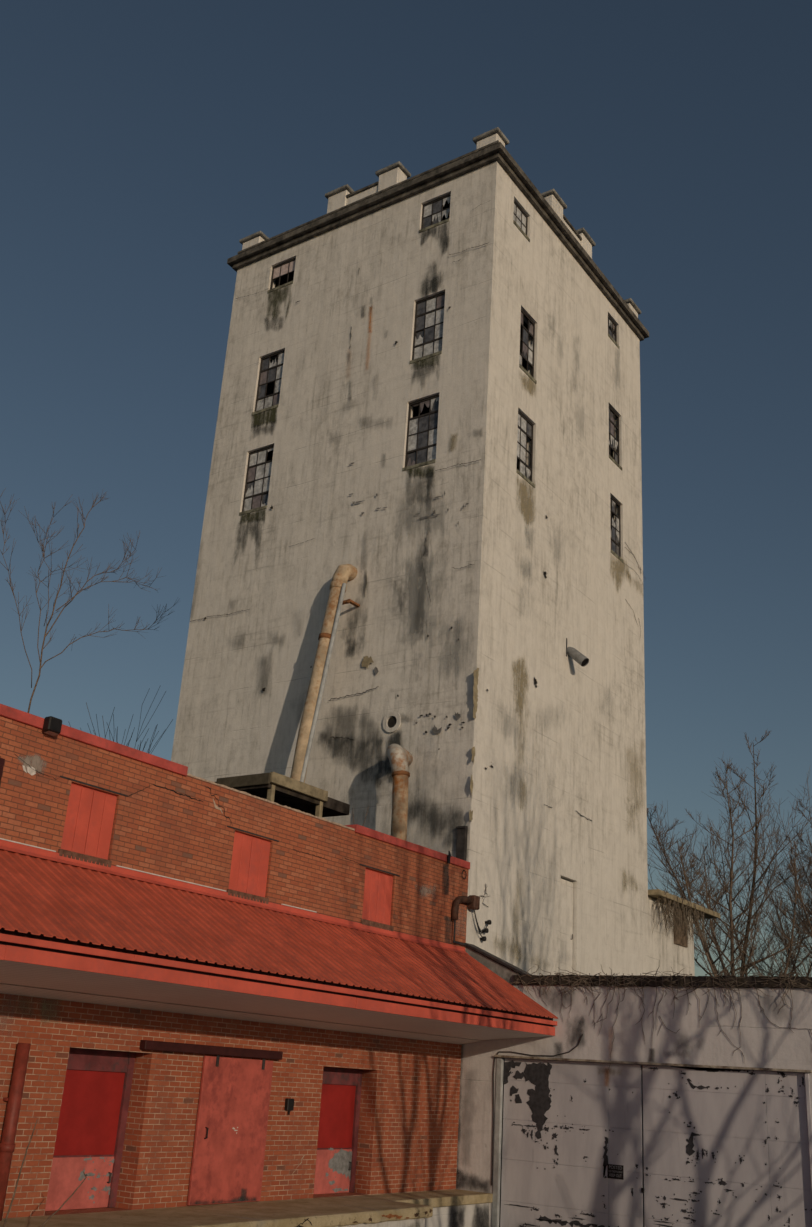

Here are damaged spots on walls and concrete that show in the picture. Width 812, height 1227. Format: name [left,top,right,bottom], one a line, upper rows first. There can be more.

water stain [421,224,449,252]
water stain [267,286,289,328]
water stain [408,466,434,506]
water stain [401,548,433,635]
water stain [513,660,527,712]
water stain [322,731,401,785]
crack [129,784,232,824]
peeling [649,1066,755,1113]
peeling [503,1060,590,1170]
peeling [324,1147,352,1192]
peeling [652,1121,812,1227]
peeling [505,1195,619,1227]